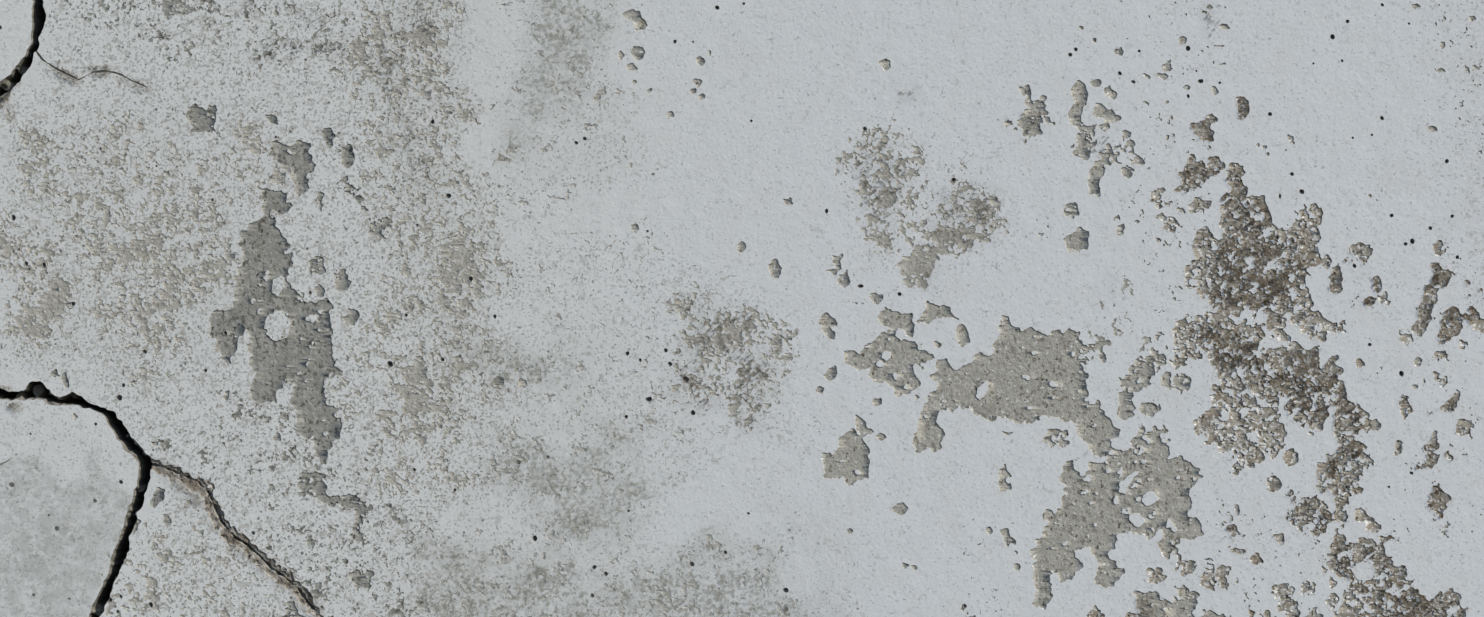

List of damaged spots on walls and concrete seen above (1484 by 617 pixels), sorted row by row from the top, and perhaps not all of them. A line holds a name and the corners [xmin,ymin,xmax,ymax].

crack [0,0,148,103]
crack [0,381,334,617]
peeling [0,0,800,617]
peeling [815,0,1484,617]